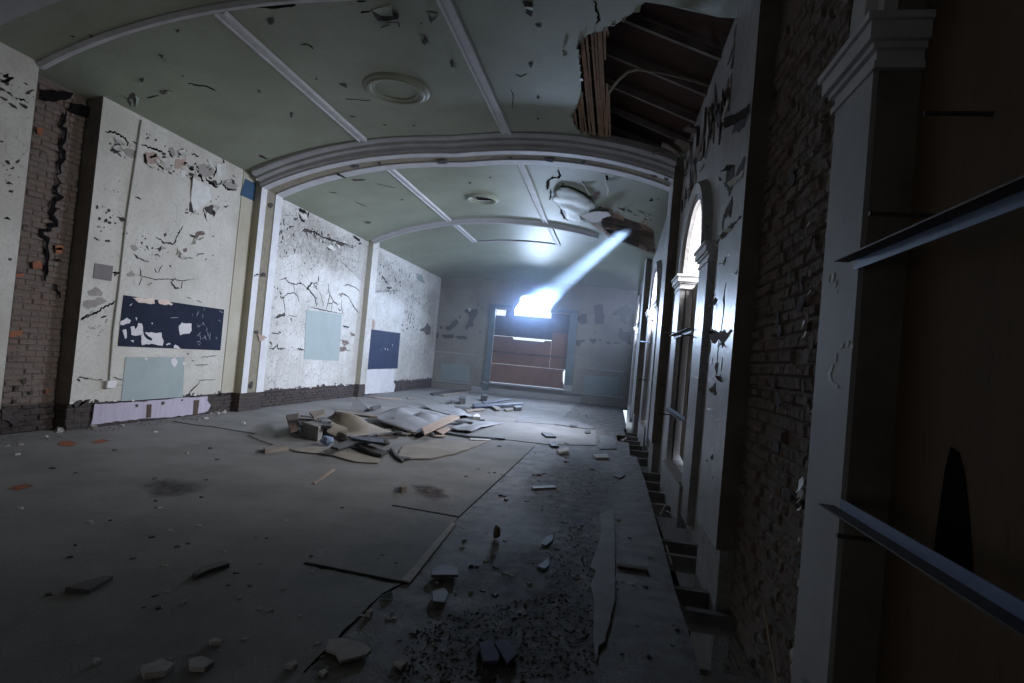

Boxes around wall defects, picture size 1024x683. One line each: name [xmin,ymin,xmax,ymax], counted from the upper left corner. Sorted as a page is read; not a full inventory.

flaking render [0,73,90,118]
peeling [680,24,751,213]
crack [40,110,67,299]
peeling [94,130,238,277]
flaking render [581,174,659,232]
peeling [713,156,746,246]
crack [139,265,202,303]
crack [276,277,359,314]
peeling [708,297,732,348]
crack [392,447,534,518]
flaking render [794,457,809,511]
crack [303,563,407,672]